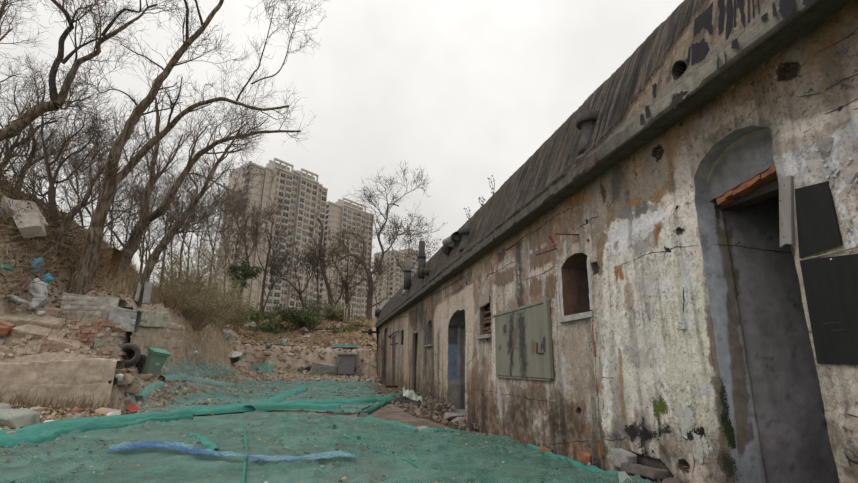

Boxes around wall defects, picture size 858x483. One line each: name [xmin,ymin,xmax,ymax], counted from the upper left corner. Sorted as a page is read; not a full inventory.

spalling [774,61,801,82]
crack [799,69,858,114]
spalling [651,144,664,162]
crack [618,241,791,267]
water stain [509,241,527,376]
water stain [607,418,670,457]
water stain [681,427,706,441]